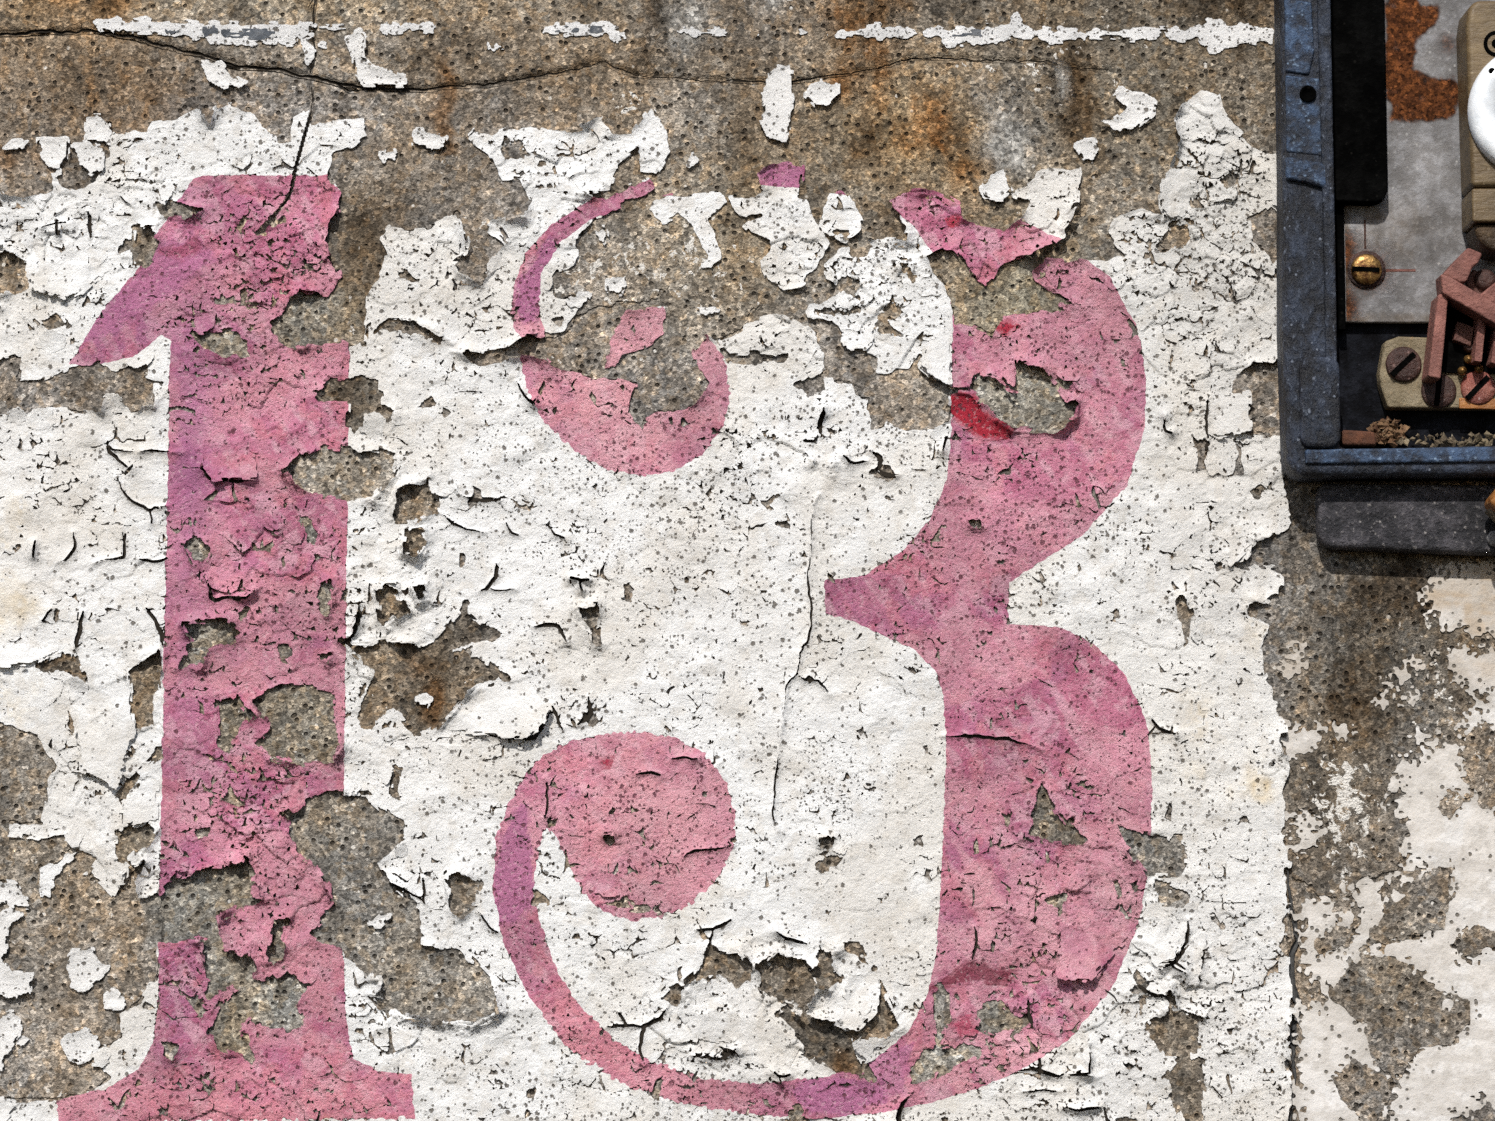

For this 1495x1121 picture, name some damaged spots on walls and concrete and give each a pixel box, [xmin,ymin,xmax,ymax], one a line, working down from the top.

peeling [2,113,115,176]
crack [0,0,1108,207]
peeling [759,64,840,142]
rust [1385,0,1458,122]
peeling [270,127,532,557]
peeling [530,197,760,429]
peeling [810,244,1090,441]
peeling [0,572,551,1121]
peeling [651,939,900,1098]
crack [896,1092,913,1121]
peeling [1144,990,1211,1121]
peeling [1291,761,1495,1121]